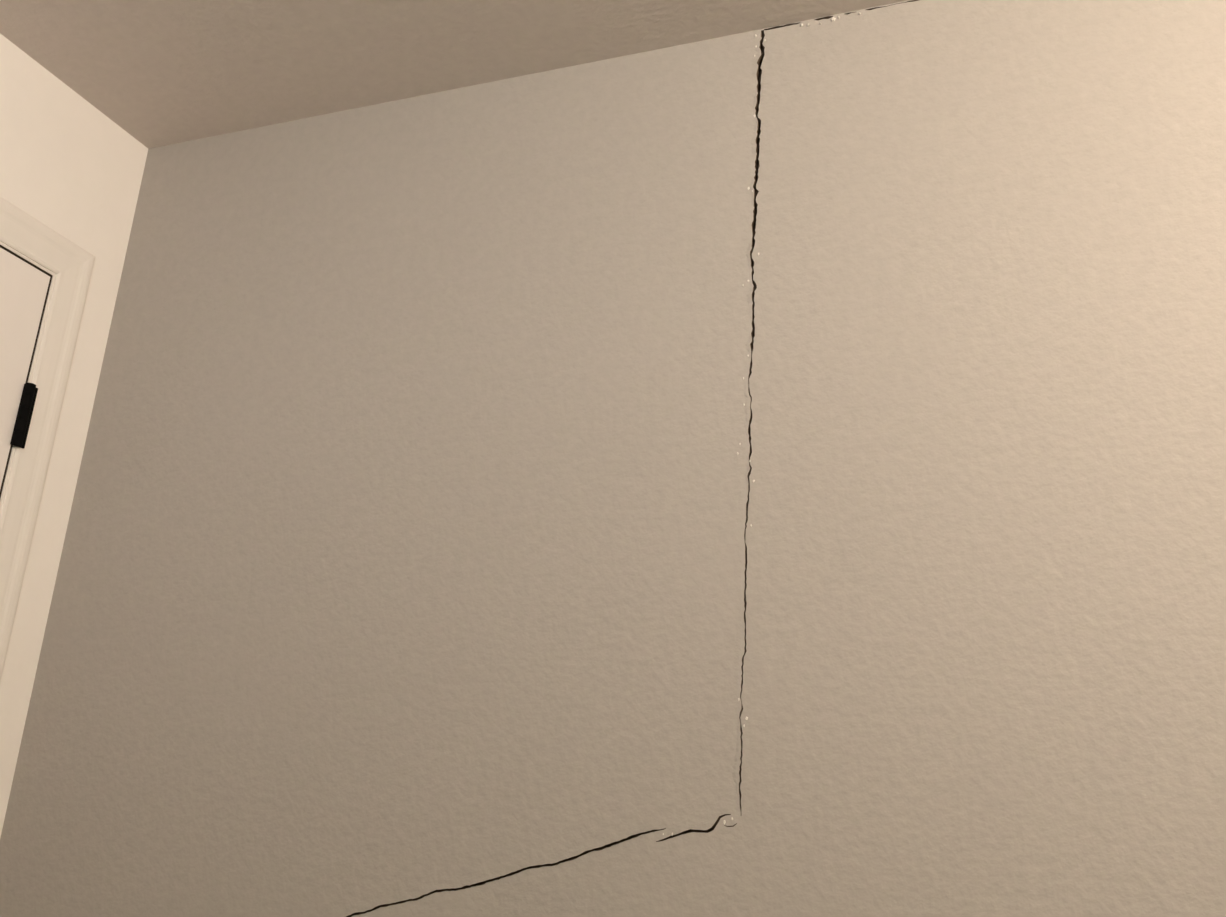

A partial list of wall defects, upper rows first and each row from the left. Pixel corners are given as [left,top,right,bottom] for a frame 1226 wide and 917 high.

crack [346,0,918,917]